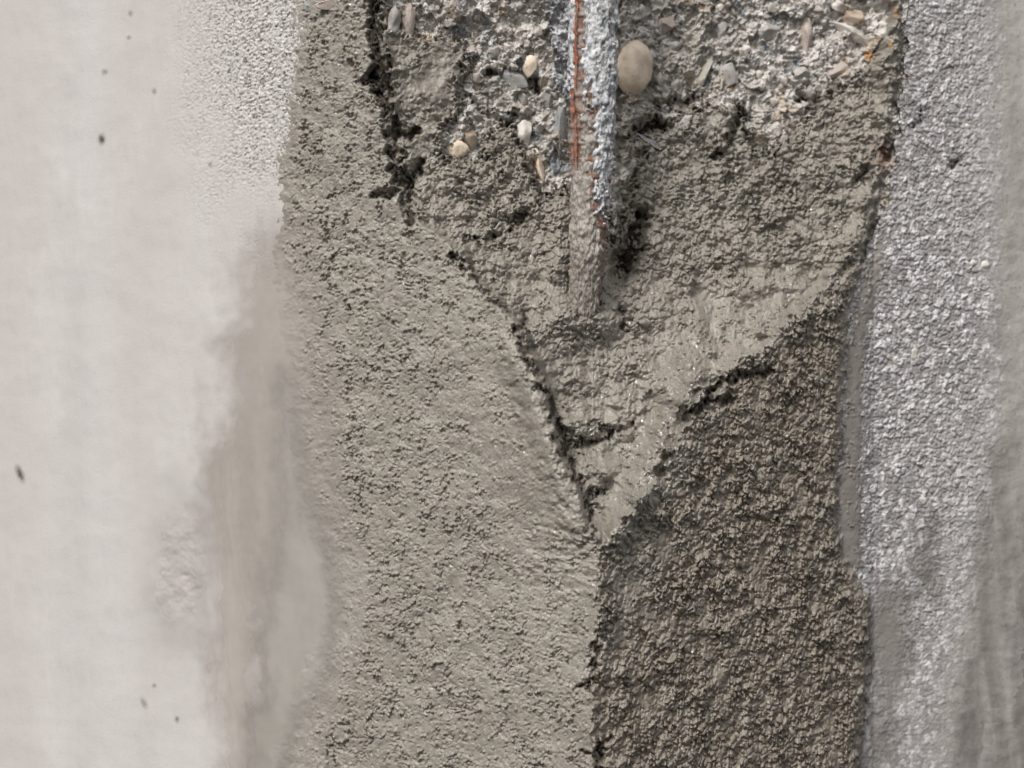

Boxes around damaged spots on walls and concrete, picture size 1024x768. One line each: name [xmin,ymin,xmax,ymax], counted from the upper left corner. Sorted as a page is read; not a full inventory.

crack [356,1,425,225]
spalling [383,0,571,196]
corrosion [570,0,579,168]
spalling [606,0,909,244]
crack [450,212,635,541]
crack [683,366,775,414]